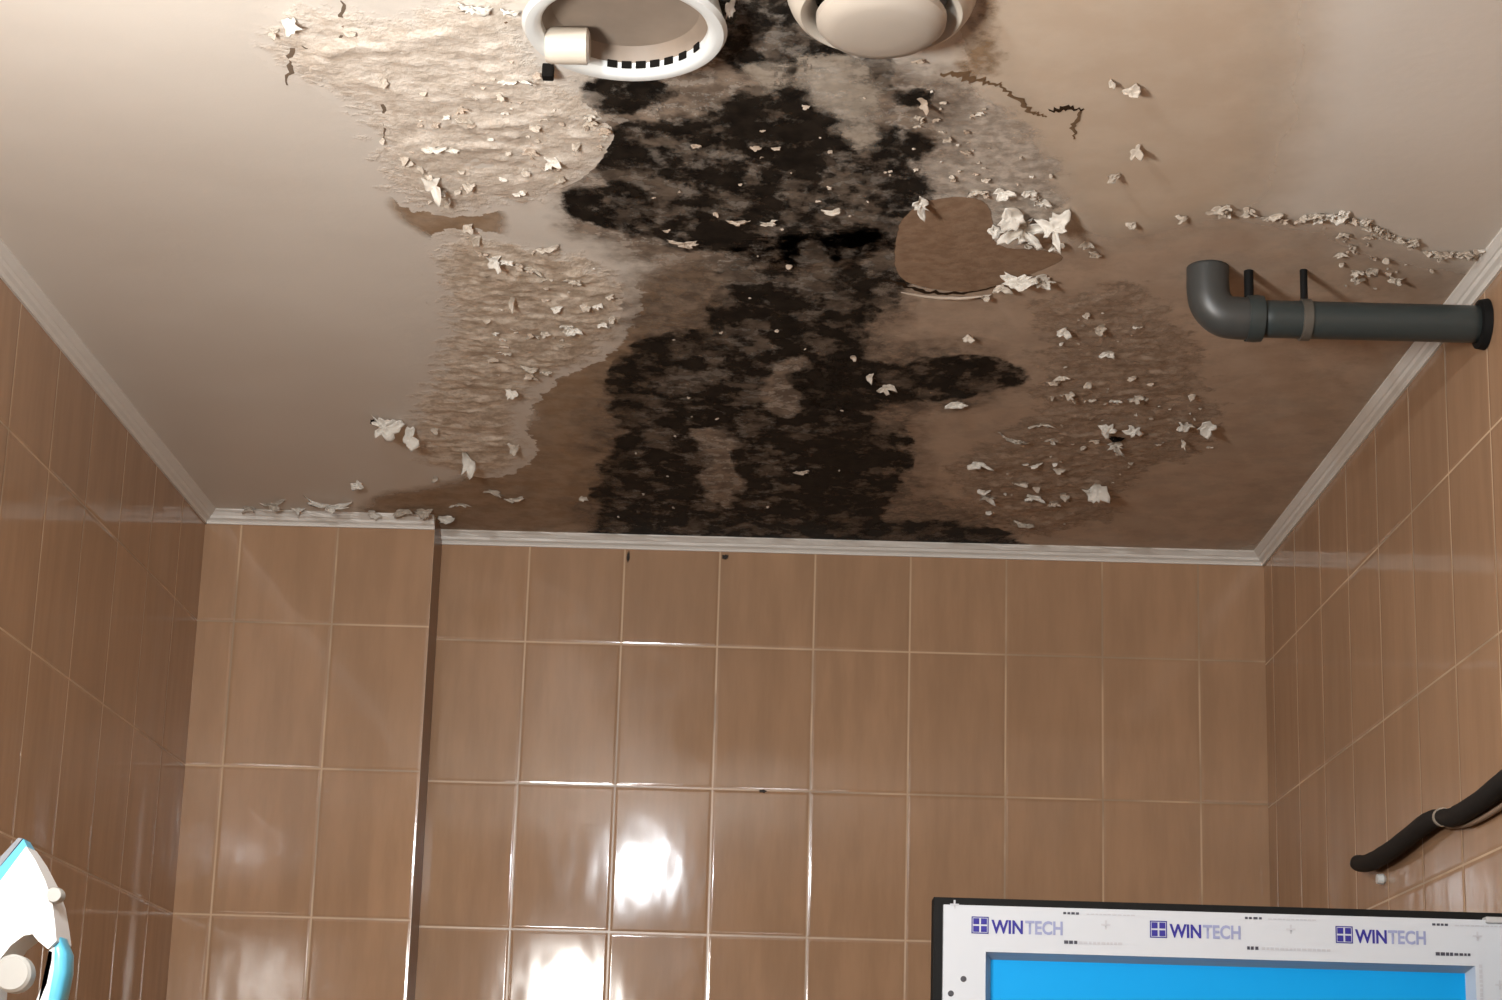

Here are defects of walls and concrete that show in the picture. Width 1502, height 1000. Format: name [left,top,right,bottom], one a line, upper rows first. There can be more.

peeling [725,0,736,21]
peeling [1109,79,1141,98]
peeling [815,186,852,217]
peeling [712,212,784,231]
peeling [247,0,647,503]
peeling [662,229,699,250]
peeling [1175,204,1486,290]
damp [365,0,1463,550]
peeling [884,84,1222,535]
peeling [850,355,898,396]
peeling [241,480,364,515]
peeling [368,503,471,524]